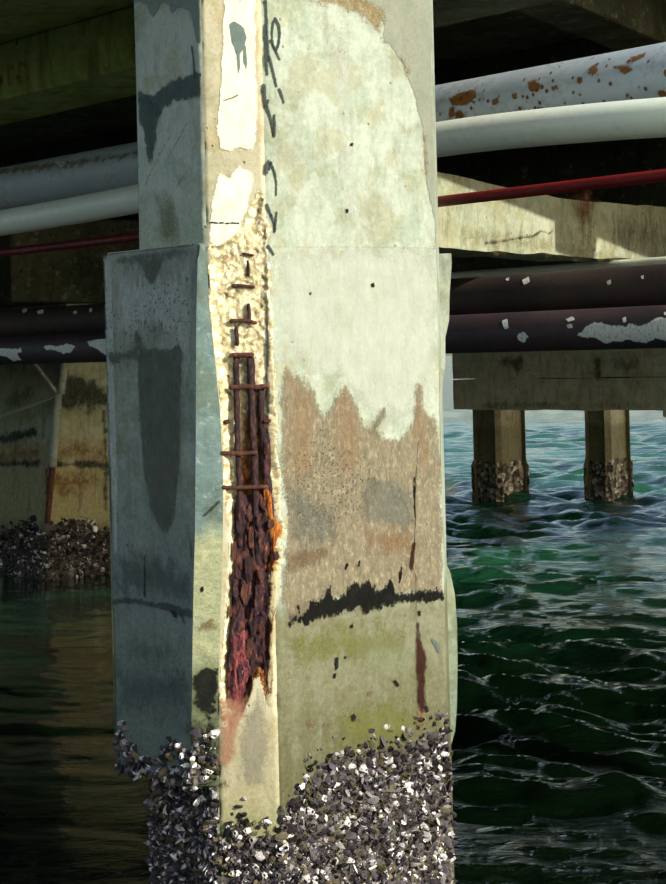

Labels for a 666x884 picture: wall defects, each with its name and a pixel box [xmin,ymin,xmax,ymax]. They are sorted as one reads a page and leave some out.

damp [138,46,201,161]
peeling [216,0,258,151]
peeling [362,0,435,217]
corrosion [439,89,499,119]
corrosion [564,53,649,104]
peeling [566,312,666,344]
damp [61,374,107,418]
damp [104,249,194,531]
spalling [192,166,287,782]
damp [277,251,444,624]
corrosion [269,569,279,620]
corrosion [416,622,427,716]